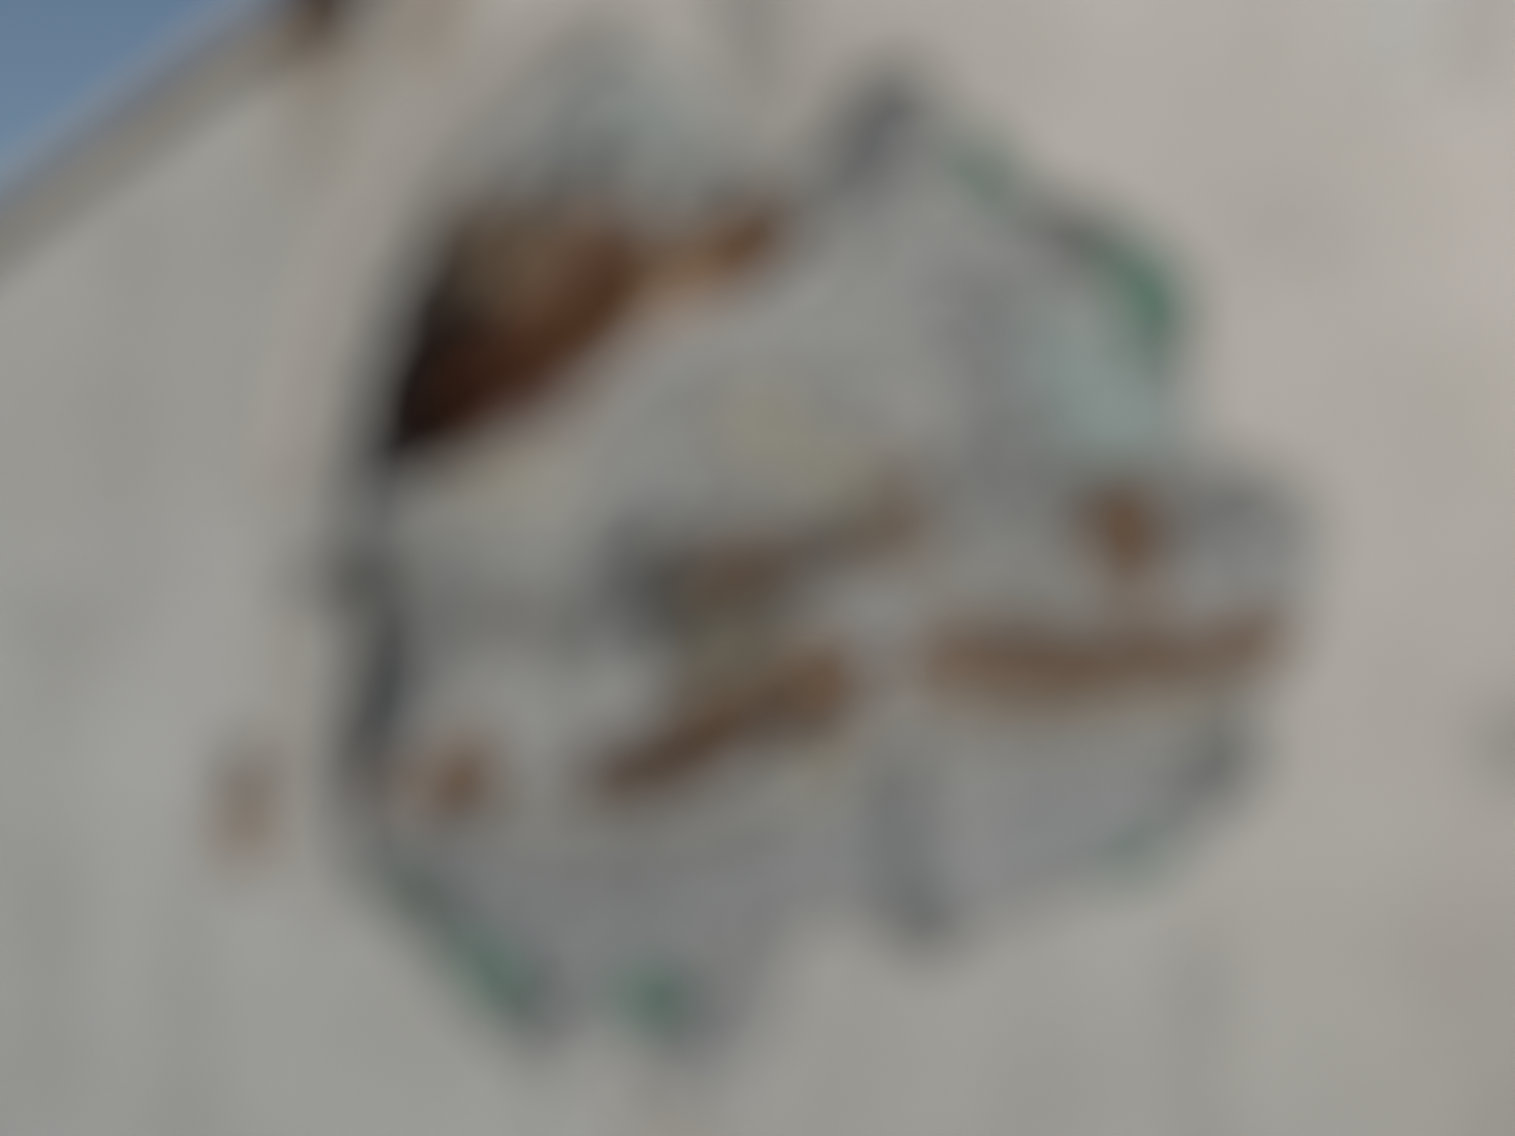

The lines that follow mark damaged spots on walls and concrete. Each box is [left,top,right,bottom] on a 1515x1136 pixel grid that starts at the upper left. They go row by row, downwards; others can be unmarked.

corrosion [364,196,718,476]
spalling [333,36,1330,1115]